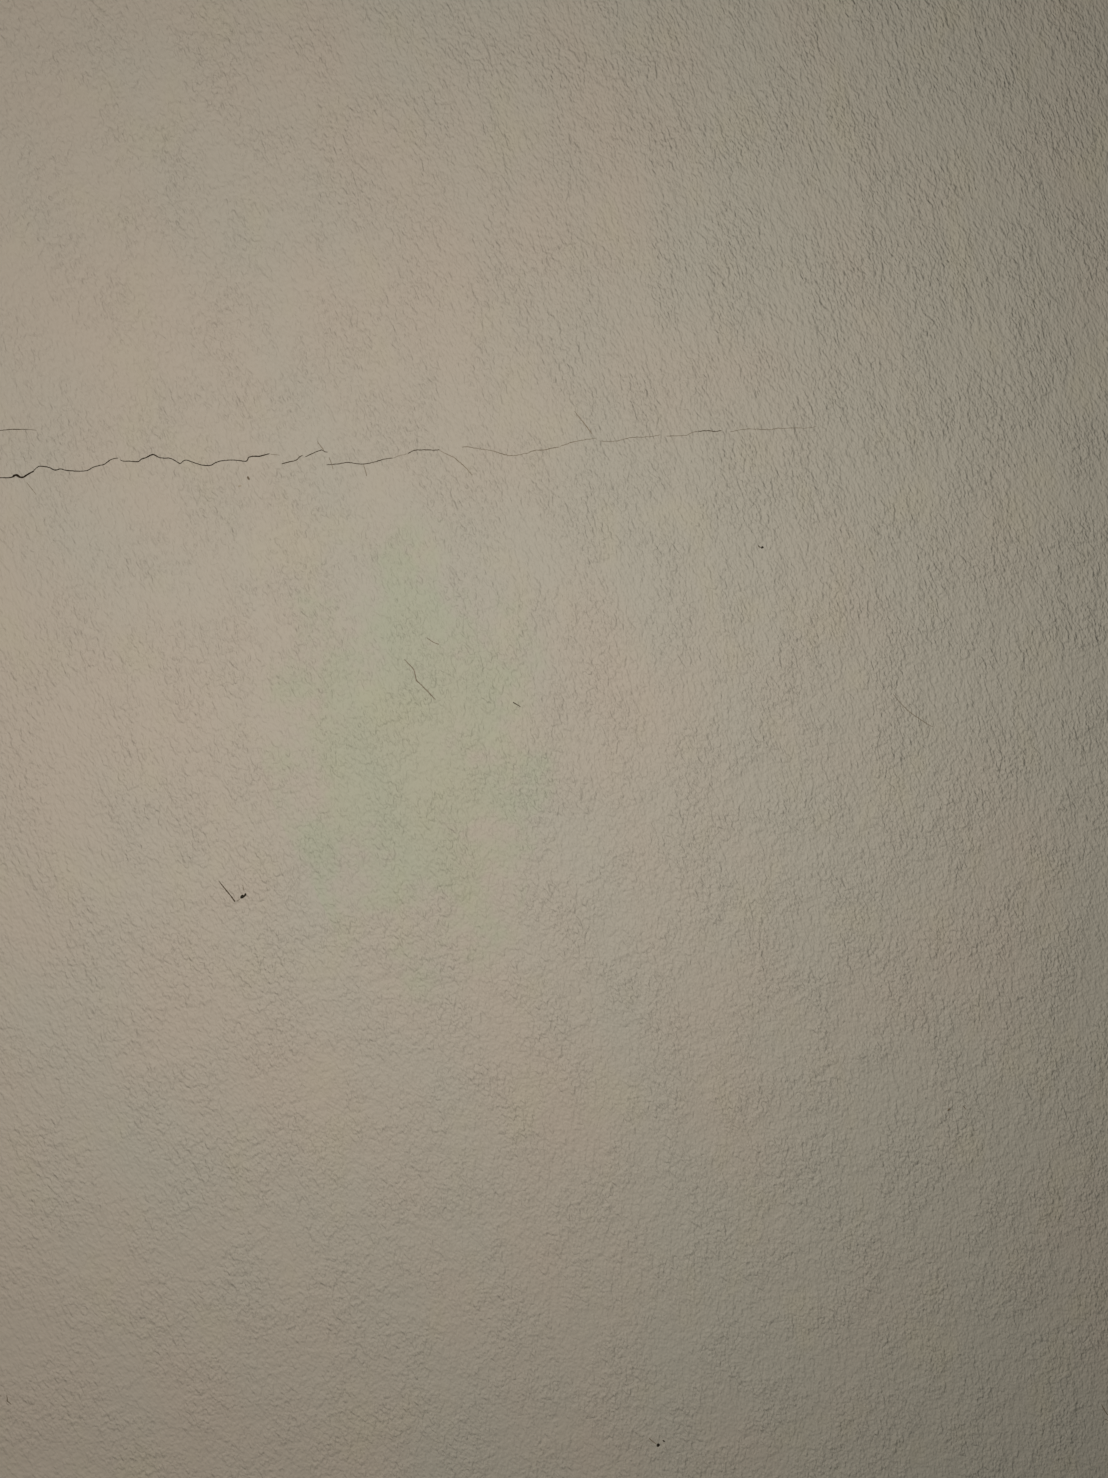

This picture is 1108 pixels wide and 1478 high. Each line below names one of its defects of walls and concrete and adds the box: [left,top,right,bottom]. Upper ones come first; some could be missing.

crack [0,412,816,494]